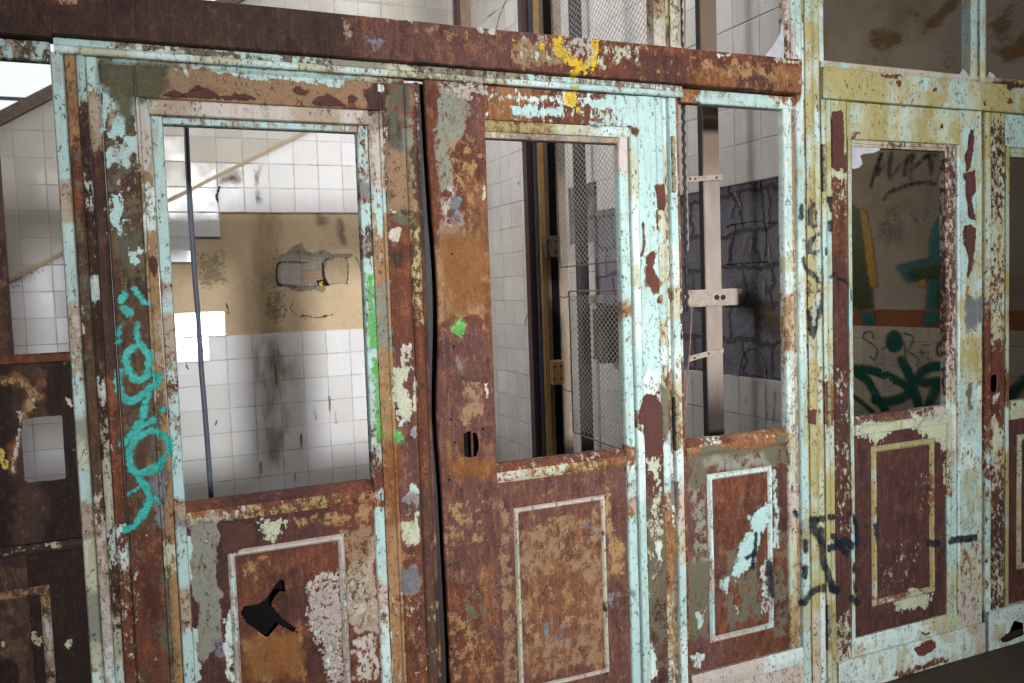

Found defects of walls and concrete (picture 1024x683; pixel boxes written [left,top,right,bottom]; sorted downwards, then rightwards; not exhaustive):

peeling [97,86,126,144]
corrosion [163,88,256,100]
corrosion [831,111,845,168]
peeling [109,193,128,236]
corrosion [966,129,976,278]
spalling [264,243,353,292]
corrosion [441,233,491,313]
corrosion [639,394,664,487]
peeling [731,502,772,582]
peeling [305,569,350,683]